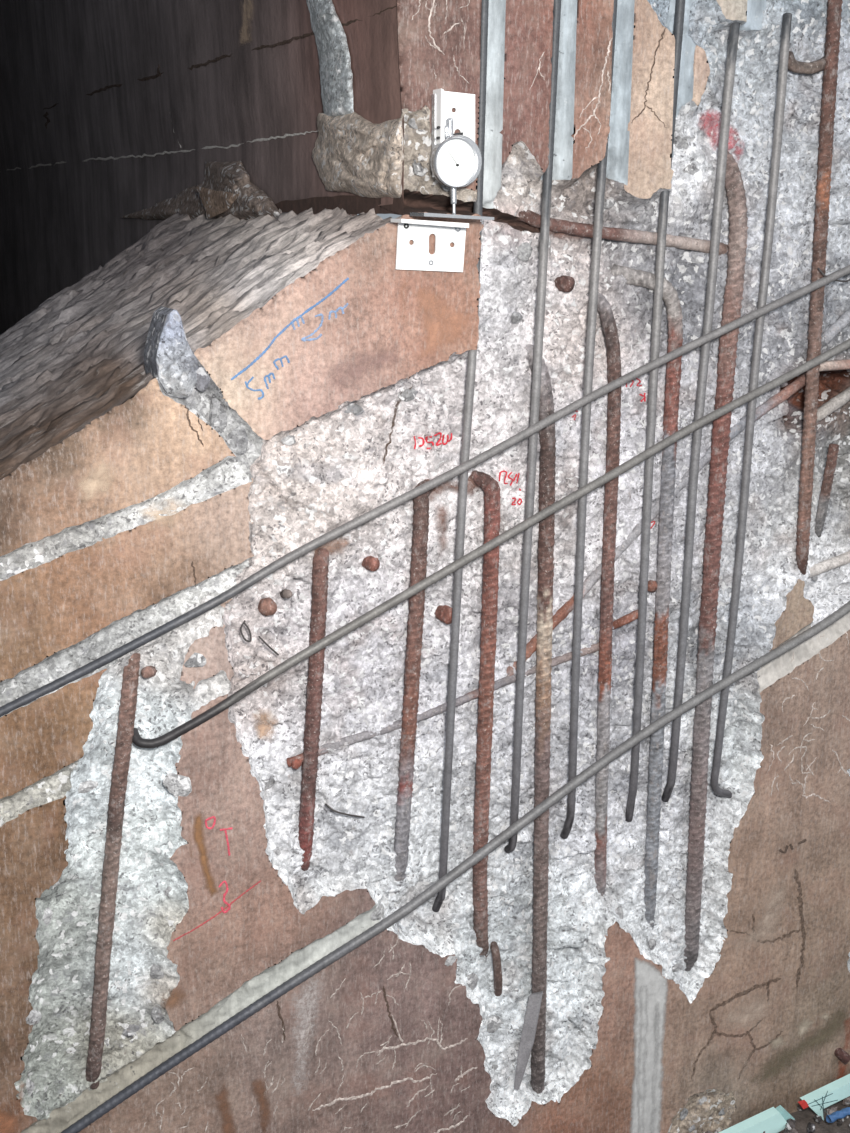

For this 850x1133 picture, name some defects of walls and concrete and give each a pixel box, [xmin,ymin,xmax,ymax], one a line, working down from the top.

crack [574,39,612,148]
crack [631,27,666,128]
spalling [312,105,477,202]
crack [275,189,540,233]
corrosion [429,481,478,546]
spalling [387,0,850,1126]
spalling [14,141,657,1120]
crack [691,871,806,1079]
crack [241,929,477,1133]
crack [144,1068,208,1131]
spalling [667,1088,736,1133]